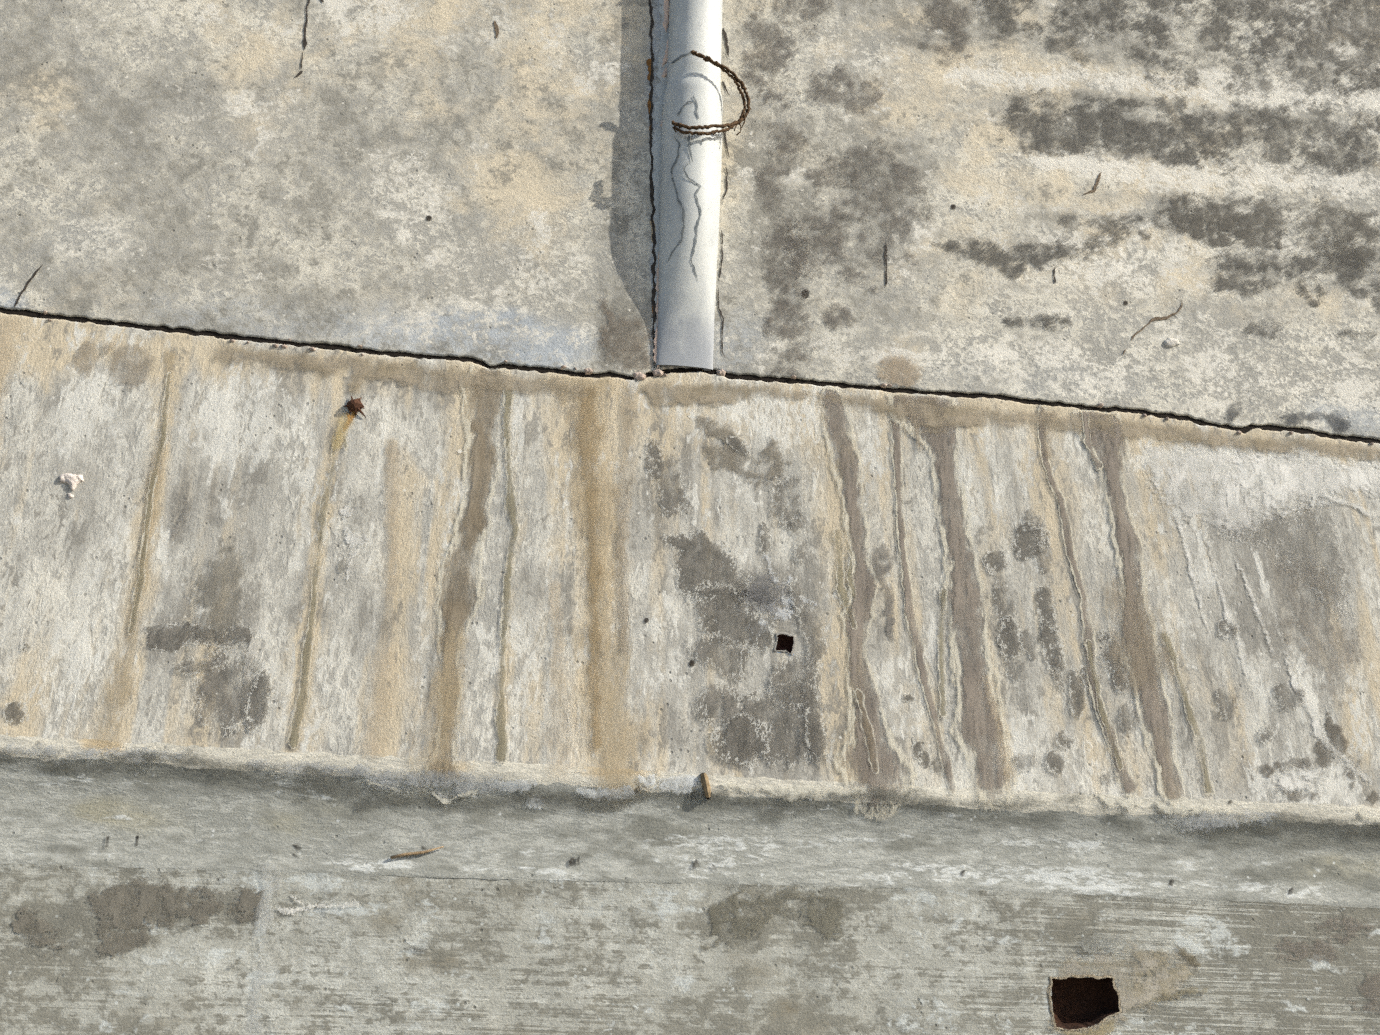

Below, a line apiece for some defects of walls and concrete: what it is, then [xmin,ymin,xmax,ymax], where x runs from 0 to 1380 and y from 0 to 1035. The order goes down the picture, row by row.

crack [0,0,1380,445]
damp [7,743,183,762]
damp [128,352,175,638]
corrosion [288,563,319,749]
corrosion [318,411,356,542]
damp [215,348,698,809]
damp [599,0,1380,831]
spalling [1048,935,1207,1035]